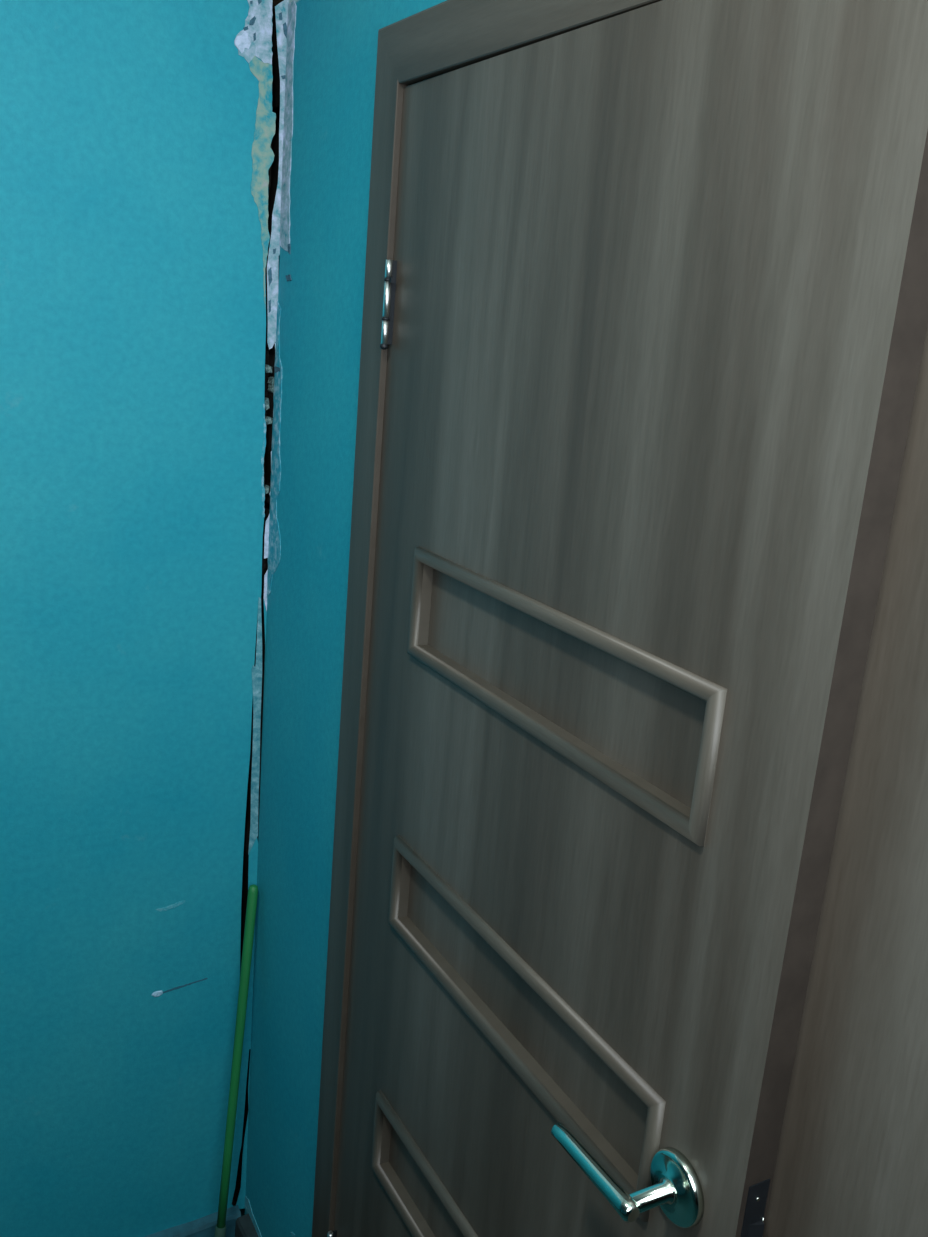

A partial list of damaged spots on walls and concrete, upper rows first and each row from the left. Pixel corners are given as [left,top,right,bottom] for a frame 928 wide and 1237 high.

flaking render [234,0,297,611]
crack [261,0,283,670]
crack [232,1050,250,1204]
crack [240,714,258,965]